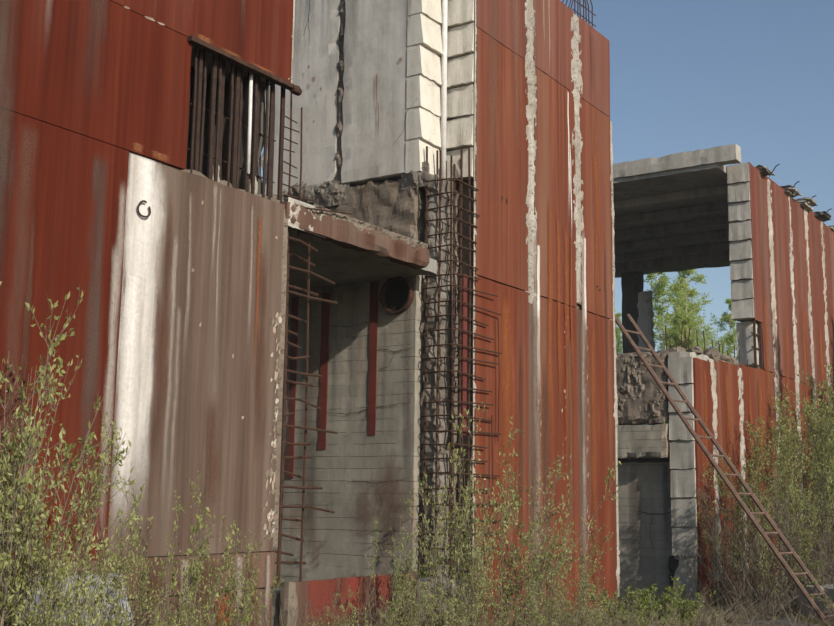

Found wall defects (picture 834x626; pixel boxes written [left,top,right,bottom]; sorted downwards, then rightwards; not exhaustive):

damp [104,154,163,486]
rust [152,229,171,414]
damp [167,202,191,412]
rust [256,220,266,400]
spalling [262,0,428,586]
rust [542,209,573,503]